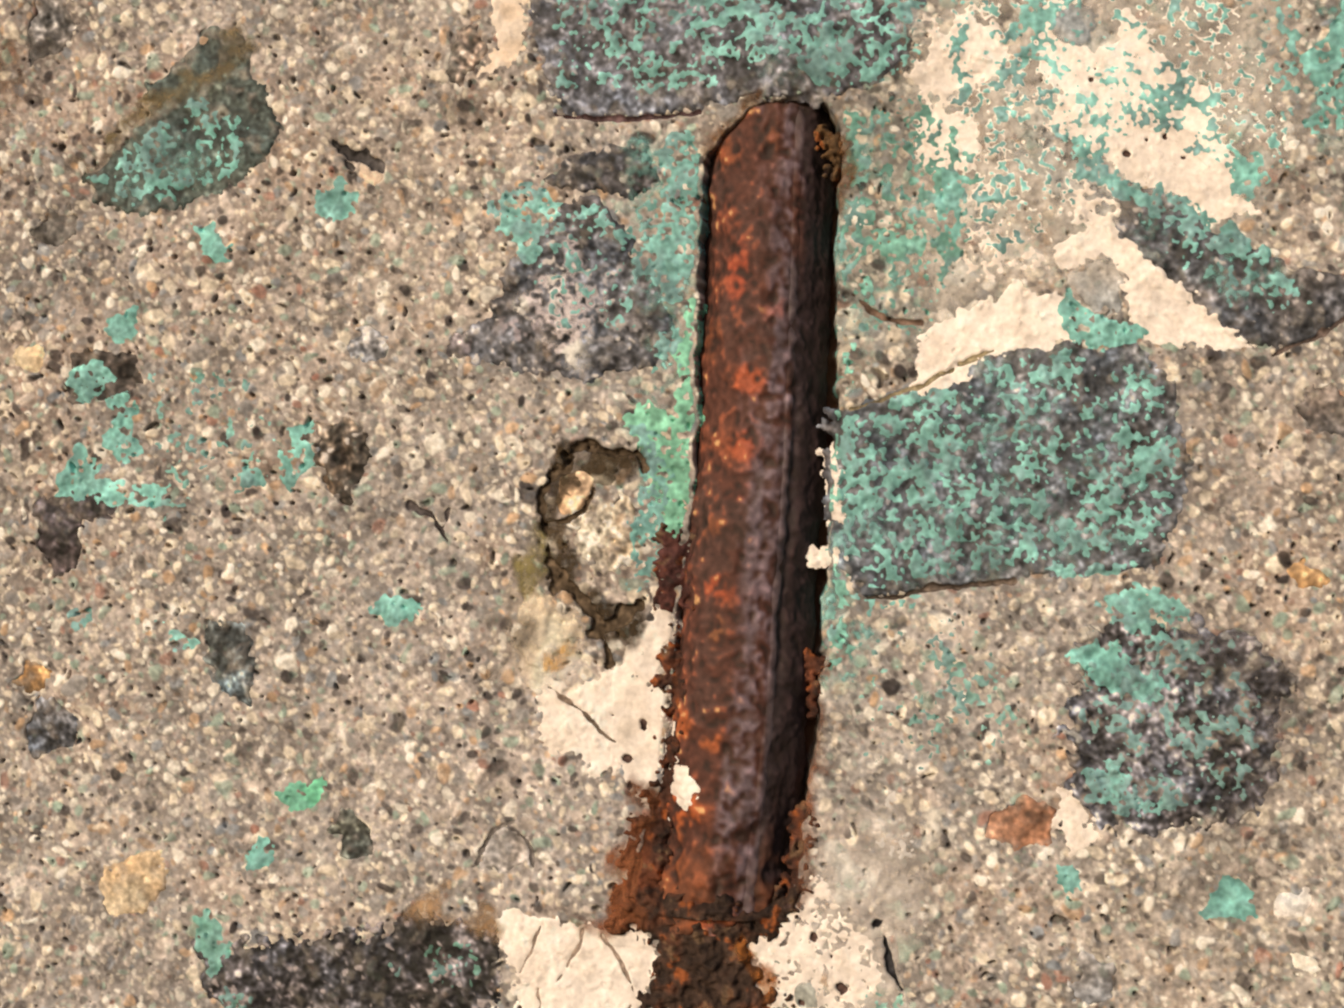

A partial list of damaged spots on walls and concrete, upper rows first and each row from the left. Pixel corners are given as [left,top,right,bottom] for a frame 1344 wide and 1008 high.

peeling [476,0,530,78]
rust [813,124,857,206]
spalling [486,0,1344,1008]
peeling [368,593,423,627]
rust [604,522,832,1008]
peeling [424,942,481,988]